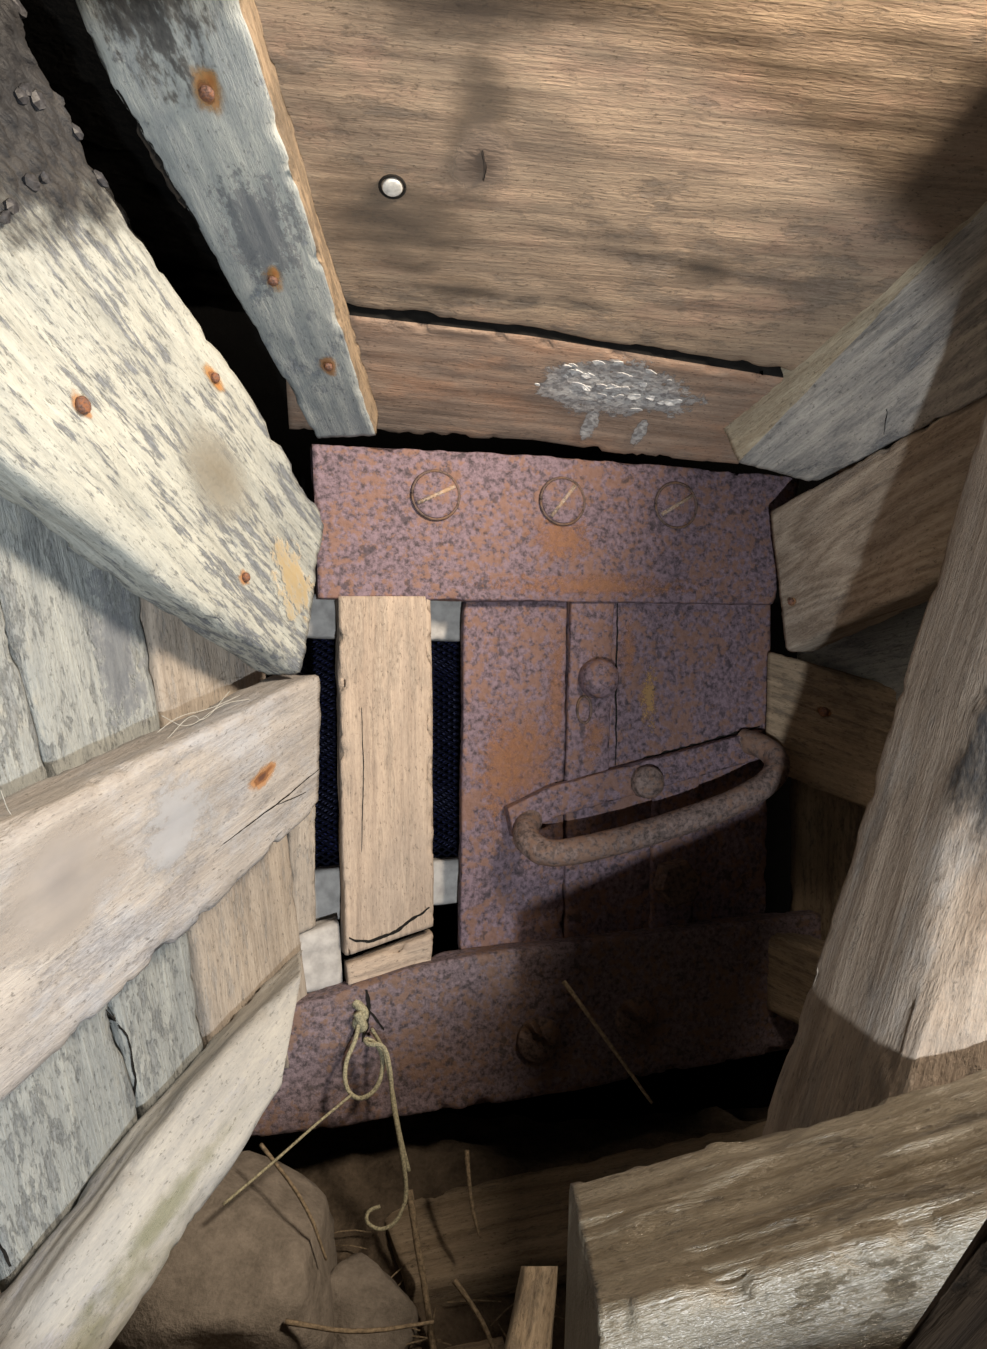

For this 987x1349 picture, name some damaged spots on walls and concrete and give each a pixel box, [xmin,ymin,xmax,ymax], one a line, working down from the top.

corrosion [192,70,220,111]
corrosion [205,365,223,391]
corrosion [320,357,335,376]
corrosion [250,762,276,789]